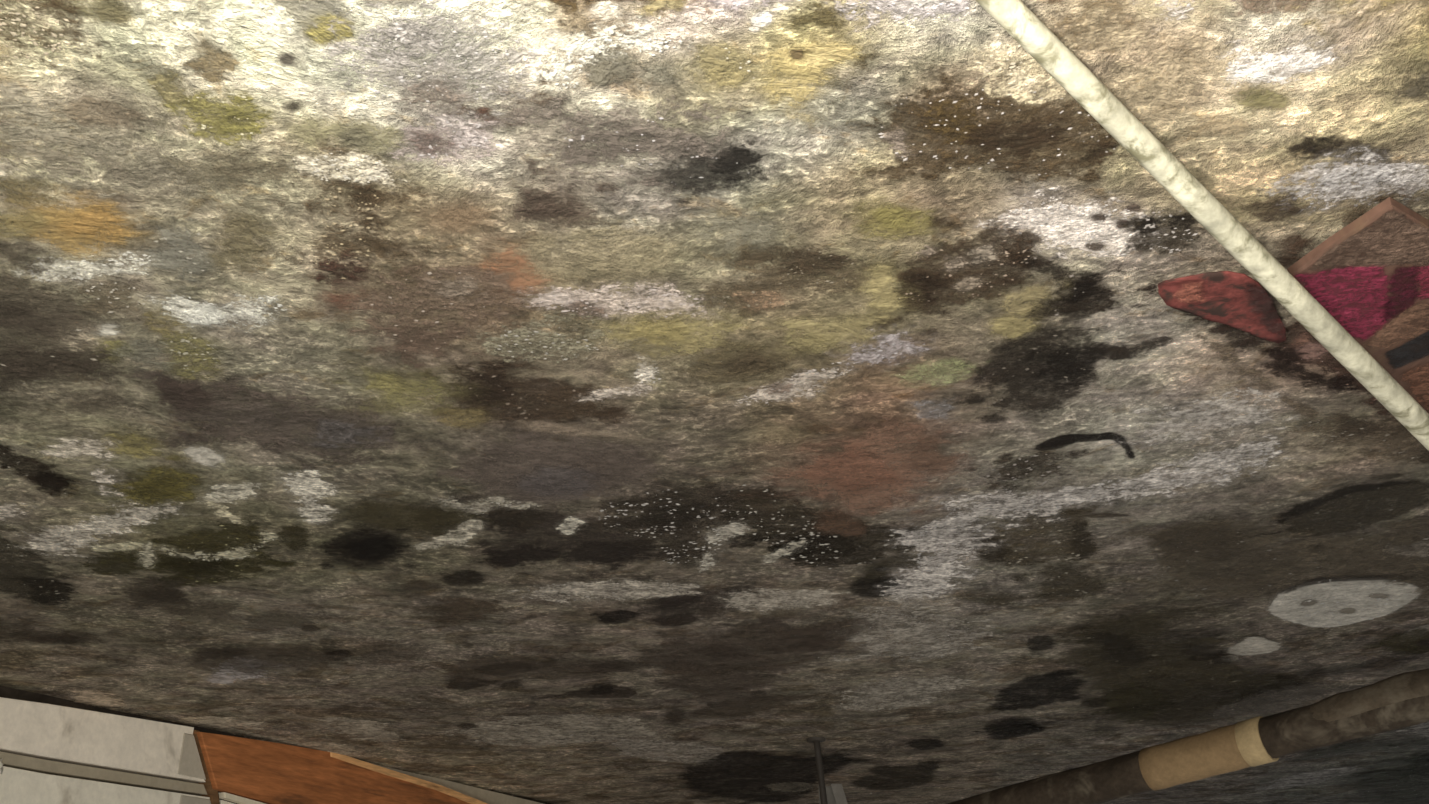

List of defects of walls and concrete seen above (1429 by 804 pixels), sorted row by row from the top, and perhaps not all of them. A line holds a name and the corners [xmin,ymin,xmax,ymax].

water stain [709,0,782,11]
water stain [183,41,241,83]
water stain [275,0,768,202]
water stain [767,0,970,104]
water stain [1247,137,1429,221]
water stain [1277,235,1312,268]
water stain [0,50,1286,726]
water stain [1281,414,1429,464]
water stain [975,474,1429,740]
water stain [448,714,944,804]